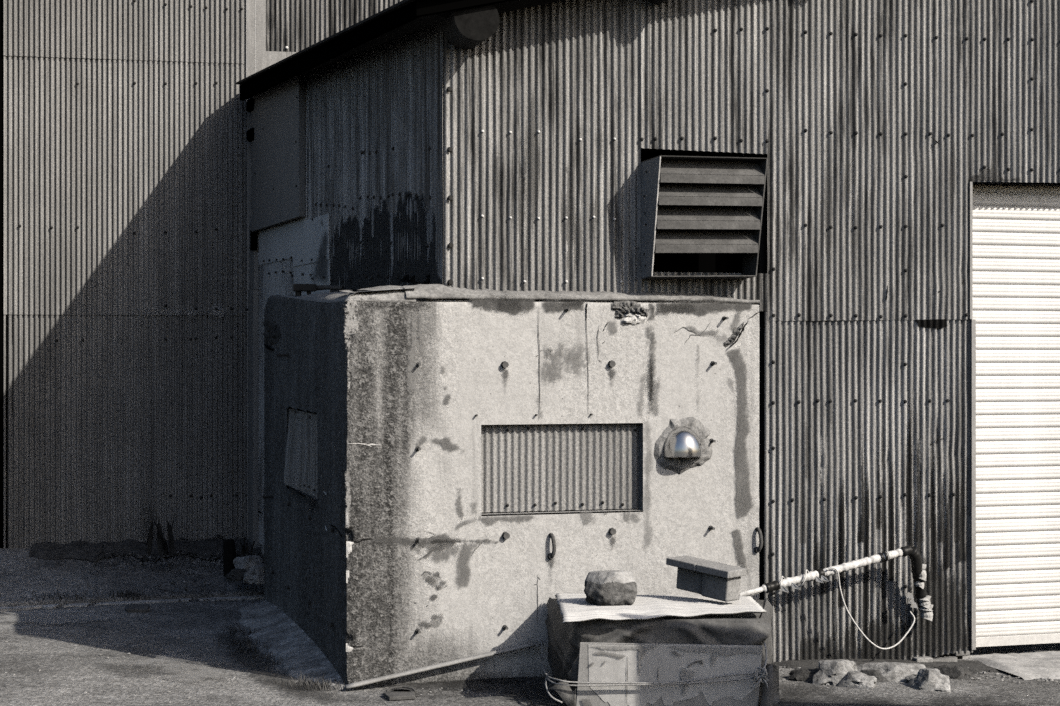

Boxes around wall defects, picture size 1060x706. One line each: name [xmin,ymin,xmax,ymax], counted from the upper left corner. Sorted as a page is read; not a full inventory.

water stain [820,135,860,279]
spalling [263,317,281,351]
spalling [603,301,649,343]
water stain [727,349,753,572]
water stain [373,489,534,587]